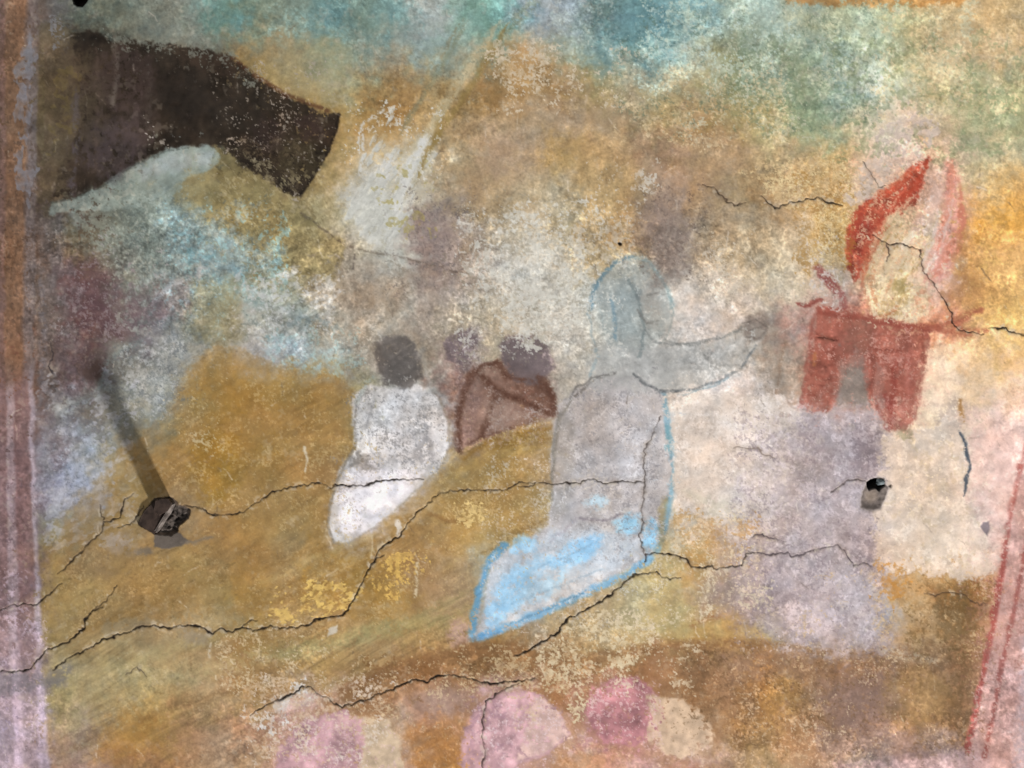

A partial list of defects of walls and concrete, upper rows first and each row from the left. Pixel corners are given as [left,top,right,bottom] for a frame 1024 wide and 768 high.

crack [862,161,887,189]
crack [702,184,844,210]
crack [872,233,1024,336]
crack [830,479,894,493]
spalling [866,478,886,492]
crack [0,416,872,768]